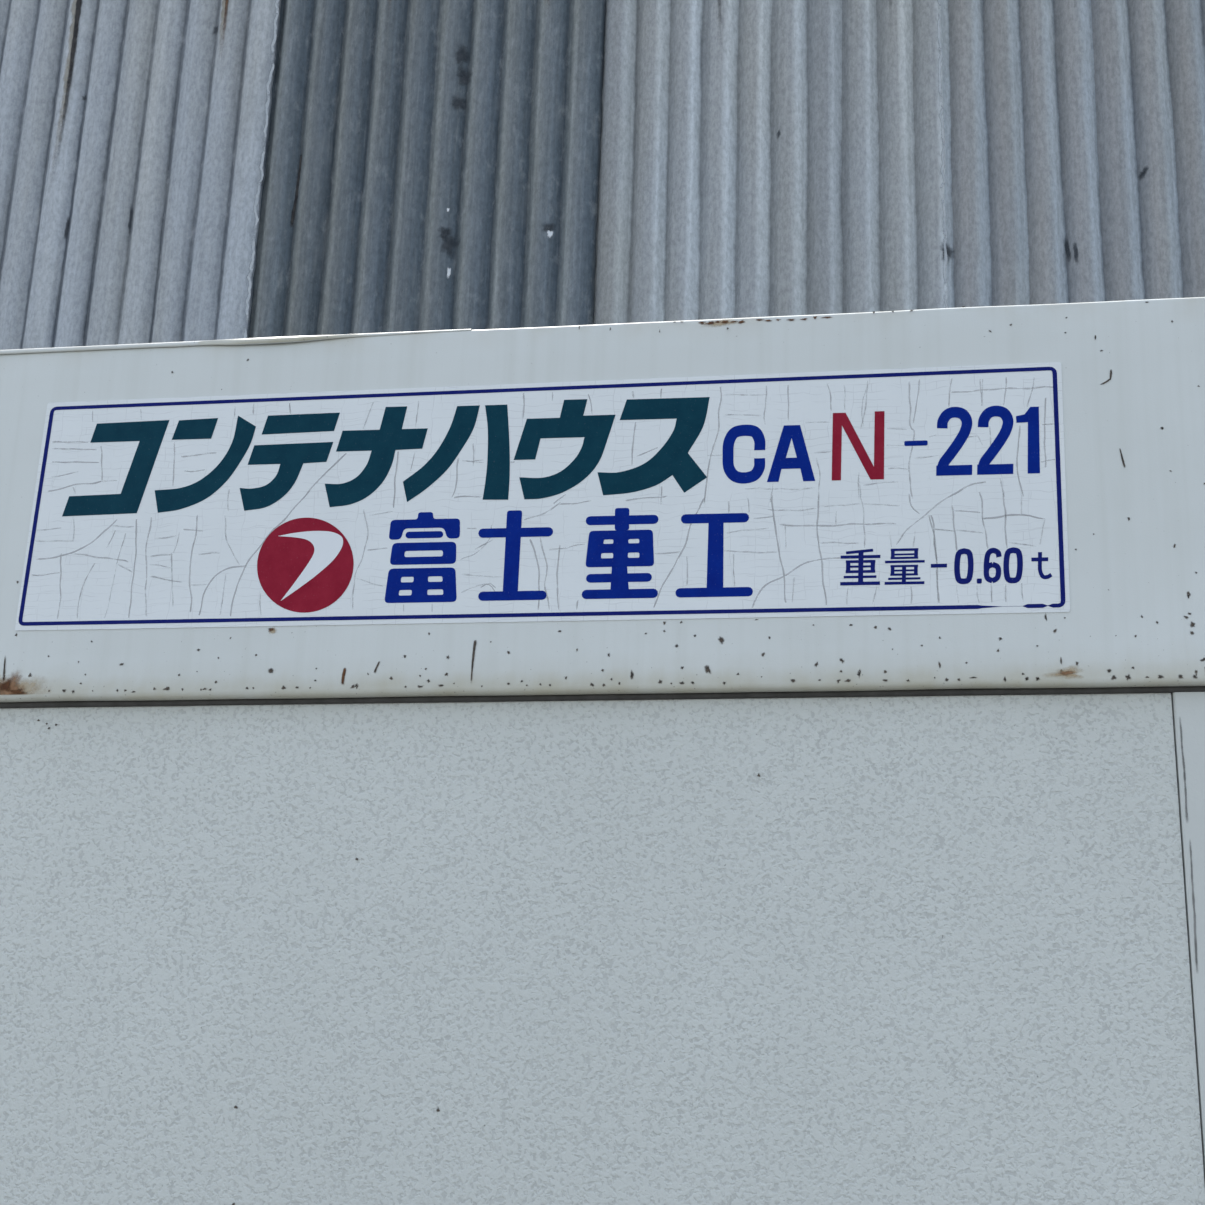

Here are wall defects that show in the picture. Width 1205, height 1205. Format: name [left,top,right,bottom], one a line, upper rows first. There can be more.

rust [63,0,82,118]
rust [0,658,35,695]